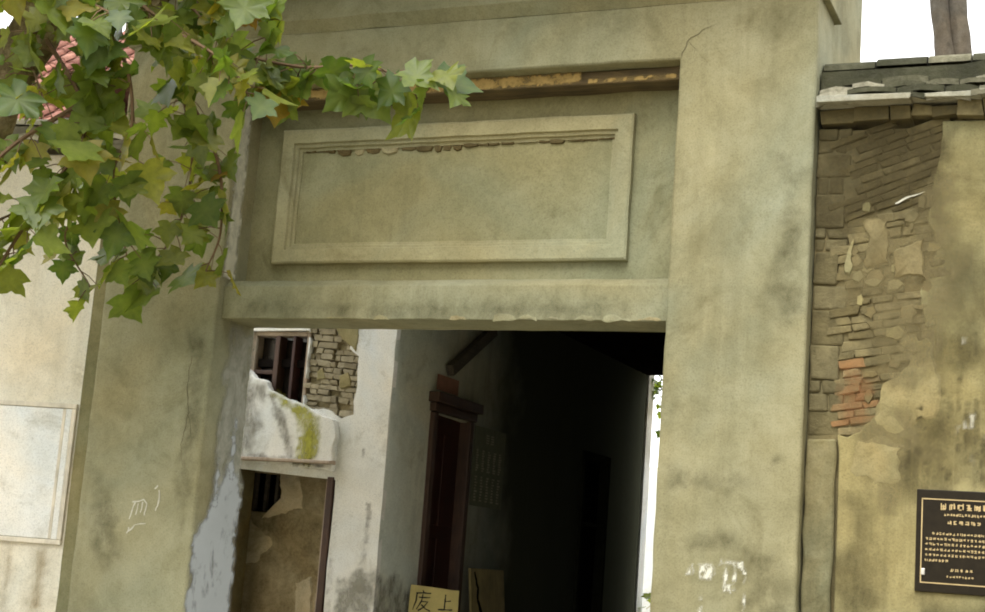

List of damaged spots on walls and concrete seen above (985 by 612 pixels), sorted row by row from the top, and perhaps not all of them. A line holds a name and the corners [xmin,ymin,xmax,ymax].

spalling [493,314,537,322]
spalling [575,314,661,323]
flaking render [826,118,964,484]
flaking render [303,317,359,418]
leakage [295,424,320,467]
peeling [246,474,303,564]
peeling [295,577,314,612]